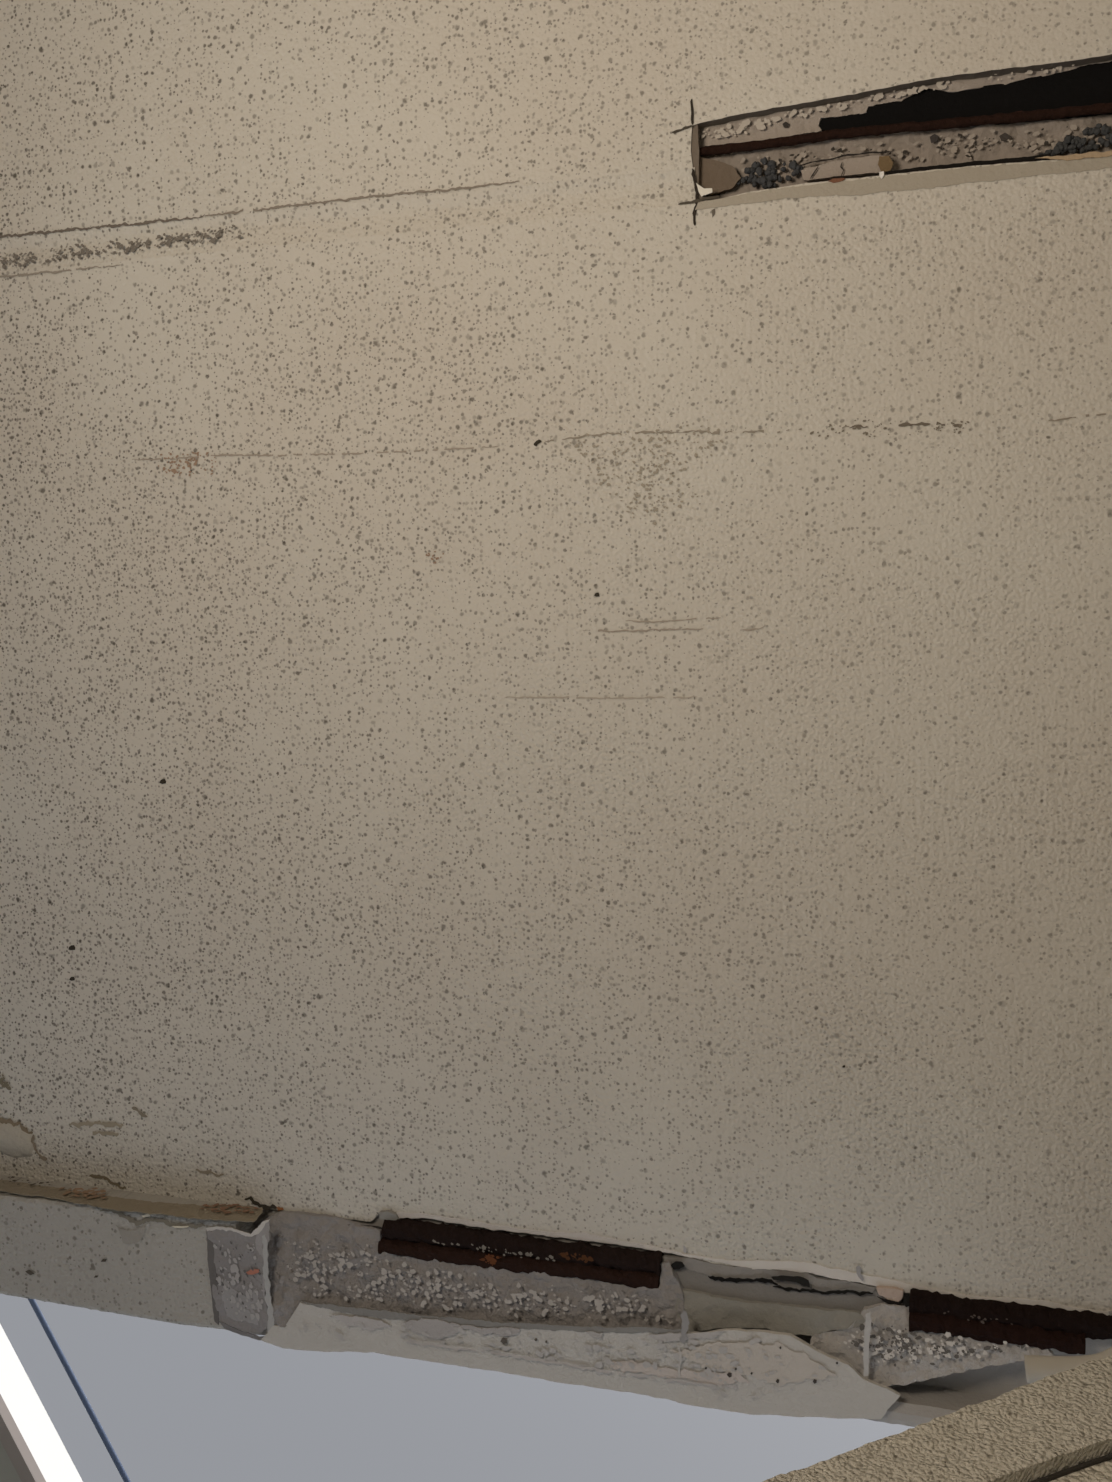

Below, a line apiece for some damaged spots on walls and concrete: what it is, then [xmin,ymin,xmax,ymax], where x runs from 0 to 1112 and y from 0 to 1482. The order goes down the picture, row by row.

spalling [691,54,1112,218]
crack [0,181,518,238]
crack [0,265,119,278]
crack [0,1118,47,1161]
crack [70,1107,147,1137]
crack [89,1174,205,1229]
crack [196,1169,277,1211]
spalling [172,1207,1112,1427]